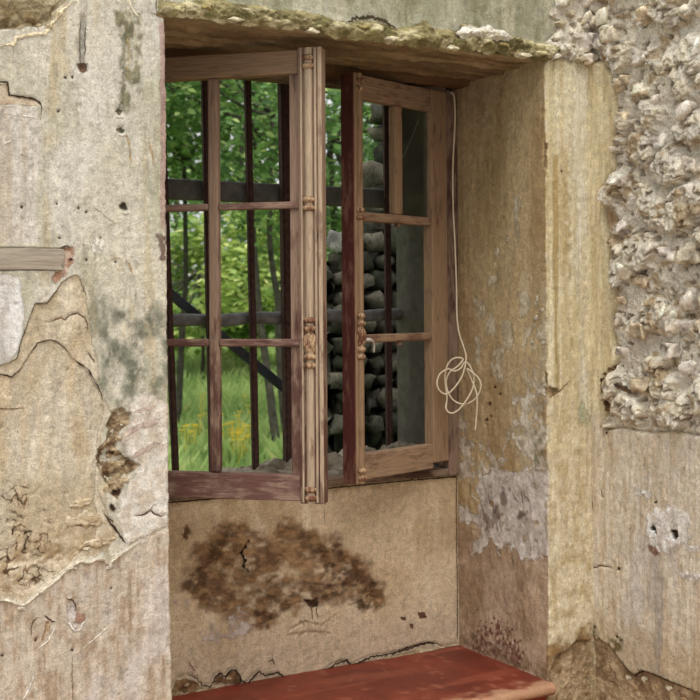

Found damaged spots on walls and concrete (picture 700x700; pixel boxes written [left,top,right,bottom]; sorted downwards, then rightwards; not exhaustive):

damp [115,11,142,114]
peeling [0,245,140,610]
peeling [458,290,559,565]
flaking render [598,365,624,411]
flaking render [613,382,636,395]
crack [0,484,53,586]
crack [137,498,213,517]
crack [240,540,249,572]
damp [183,518,384,643]
crack [328,476,458,669]
crack [181,658,284,687]
flaking render [546,625,700,700]